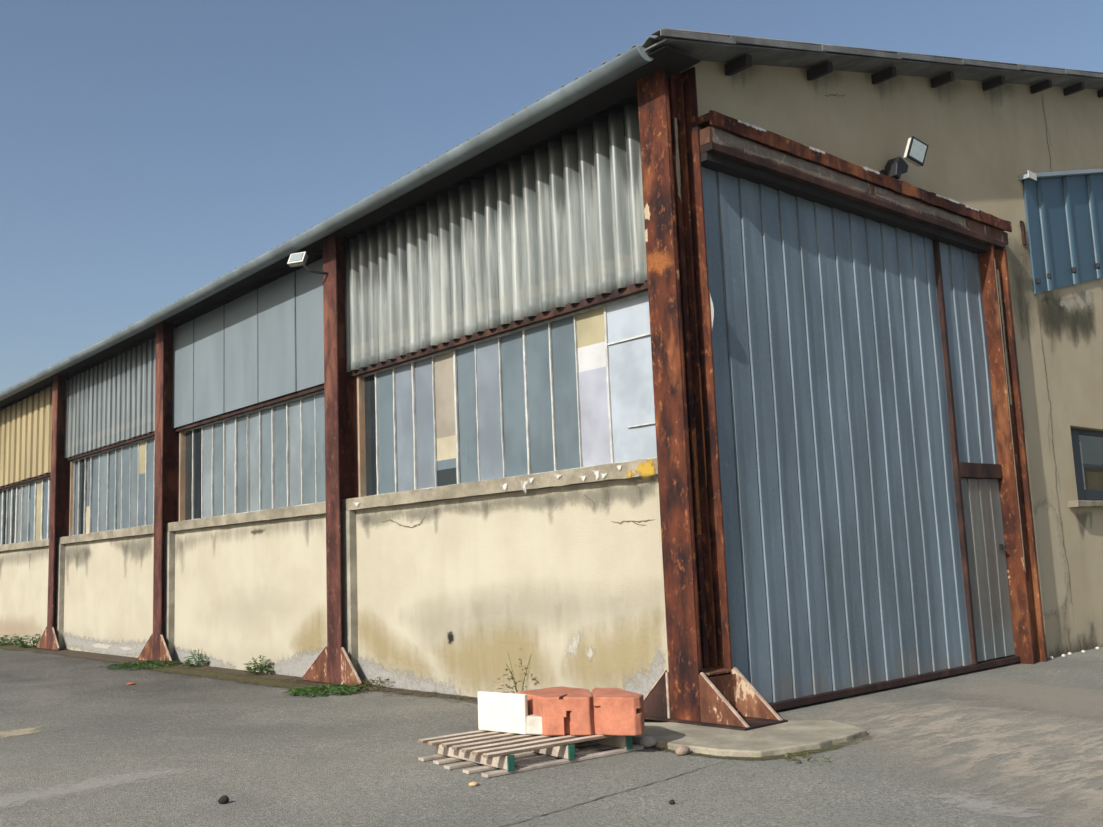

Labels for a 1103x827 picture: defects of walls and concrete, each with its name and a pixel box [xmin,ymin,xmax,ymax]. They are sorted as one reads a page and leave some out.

rust [647,249,671,275]
leakage [1012,250,1093,337]
rust [692,367,707,536]
crack [1039,316,1074,638]